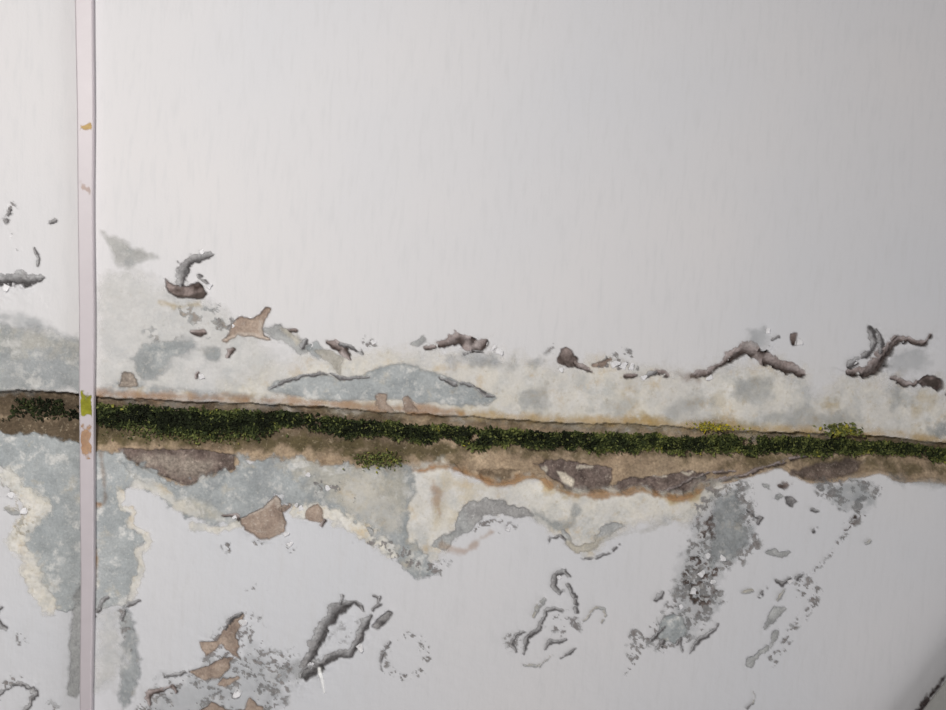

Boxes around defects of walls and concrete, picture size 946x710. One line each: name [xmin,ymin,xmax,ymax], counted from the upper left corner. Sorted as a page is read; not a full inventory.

spalling [166,249,214,299]
leakage [0,324,79,391]
leakage [299,351,946,440]
spalling [890,375,942,391]
spalling [118,448,235,485]
leakage [0,431,81,697]
peeling [136,594,392,710]
spalling [222,496,327,553]
leakage [95,450,721,706]
peeling [504,569,607,667]
peeling [538,459,790,673]
spalling [746,458,882,668]